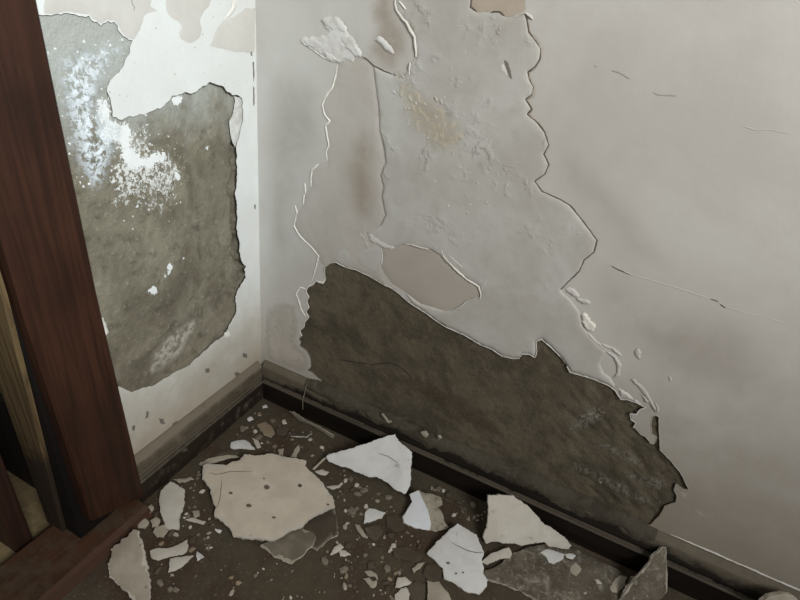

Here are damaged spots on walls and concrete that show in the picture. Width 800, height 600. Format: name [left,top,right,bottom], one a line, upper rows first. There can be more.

damp [62,48,119,182]
peeling [210,0,255,106]
peeling [470,0,533,20]
spalling [39,0,246,392]
crack [611,265,789,325]
spalling [299,233,689,525]